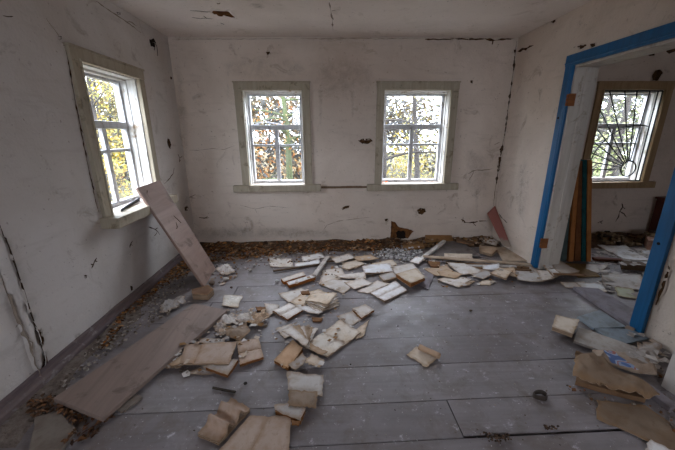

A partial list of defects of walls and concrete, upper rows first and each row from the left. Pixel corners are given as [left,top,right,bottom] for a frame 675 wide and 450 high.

spalling [207,2,238,20]
crack [303,3,533,223]
spalling [384,218,415,240]
crack [0,226,45,374]
spalling [652,262,672,311]